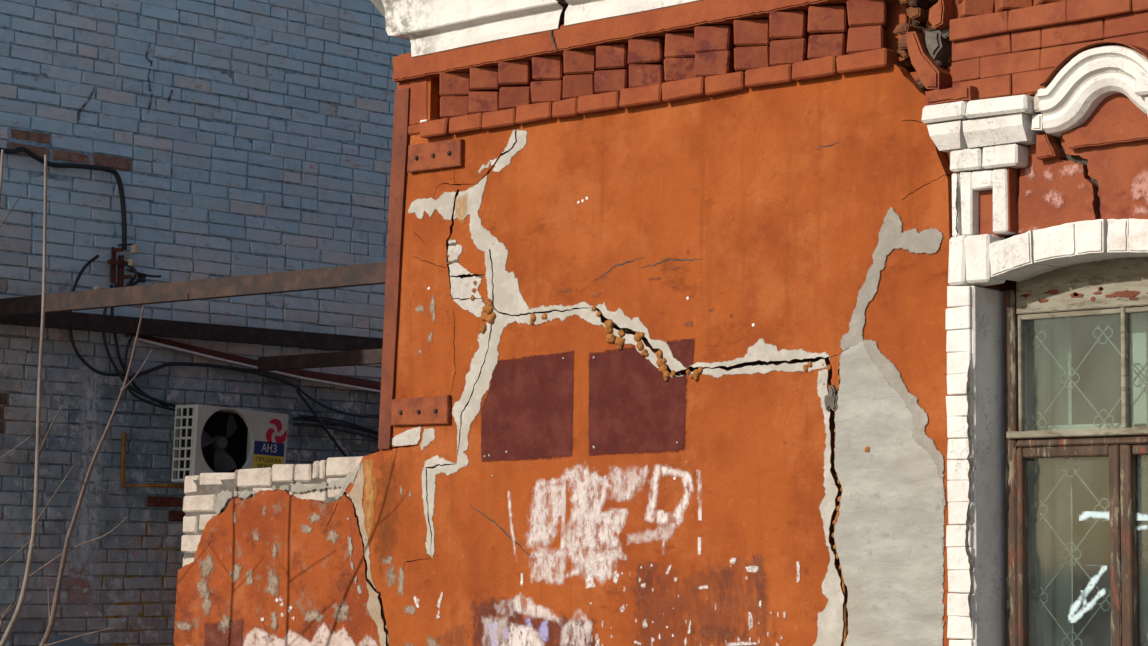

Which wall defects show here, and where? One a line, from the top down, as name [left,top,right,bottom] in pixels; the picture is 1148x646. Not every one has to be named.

crack [1059,138,1101,217]
spalling [446,239,486,317]
peeling [1020,287,1148,303]
peeling [415,297,435,353]
crack [418,130,848,646]
spalling [824,385,838,411]
peeling [301,513,320,533]
peeling [197,555,213,614]
peeling [230,564,253,585]
peeling [261,544,349,629]
crack [324,492,388,644]
peeling [725,601,786,646]